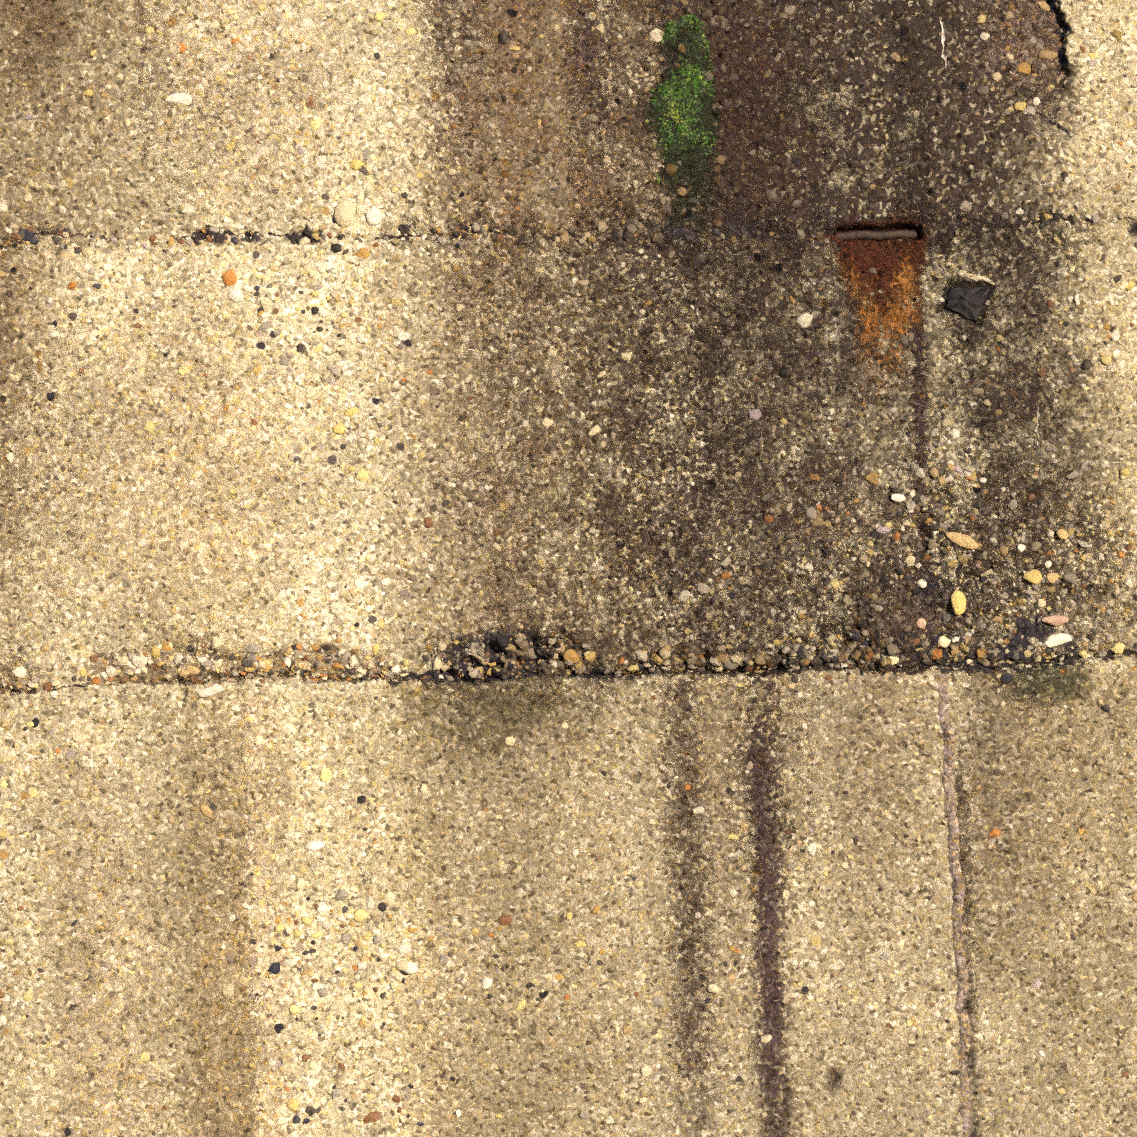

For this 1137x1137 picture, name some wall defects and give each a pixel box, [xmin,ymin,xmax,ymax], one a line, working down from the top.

leakage [425,0,1105,1137]
corrosion [830,214,926,364]